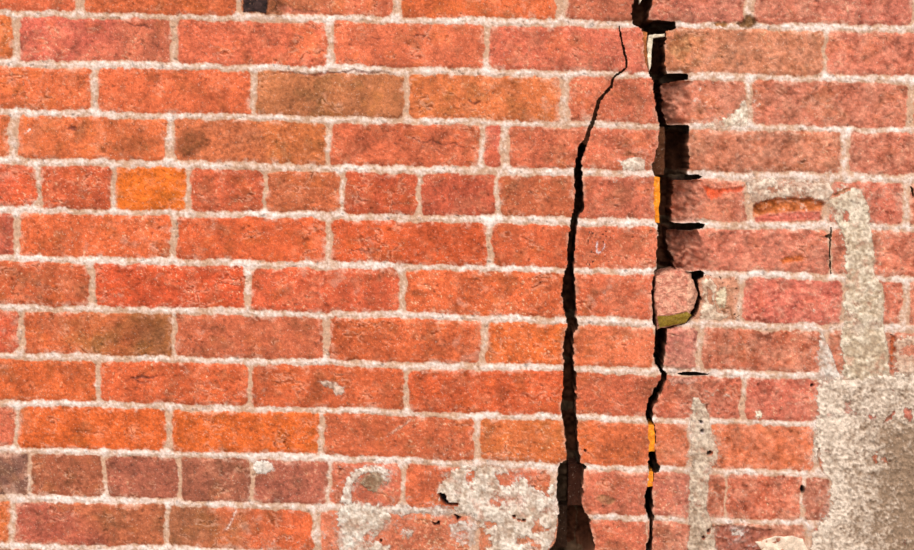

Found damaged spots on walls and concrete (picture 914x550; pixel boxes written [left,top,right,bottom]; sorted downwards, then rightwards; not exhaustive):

spalling [753,188,851,223]
crack [549,0,709,550]
peeling [810,332,840,388]
spalling [889,335,897,370]
peeling [391,492,474,546]